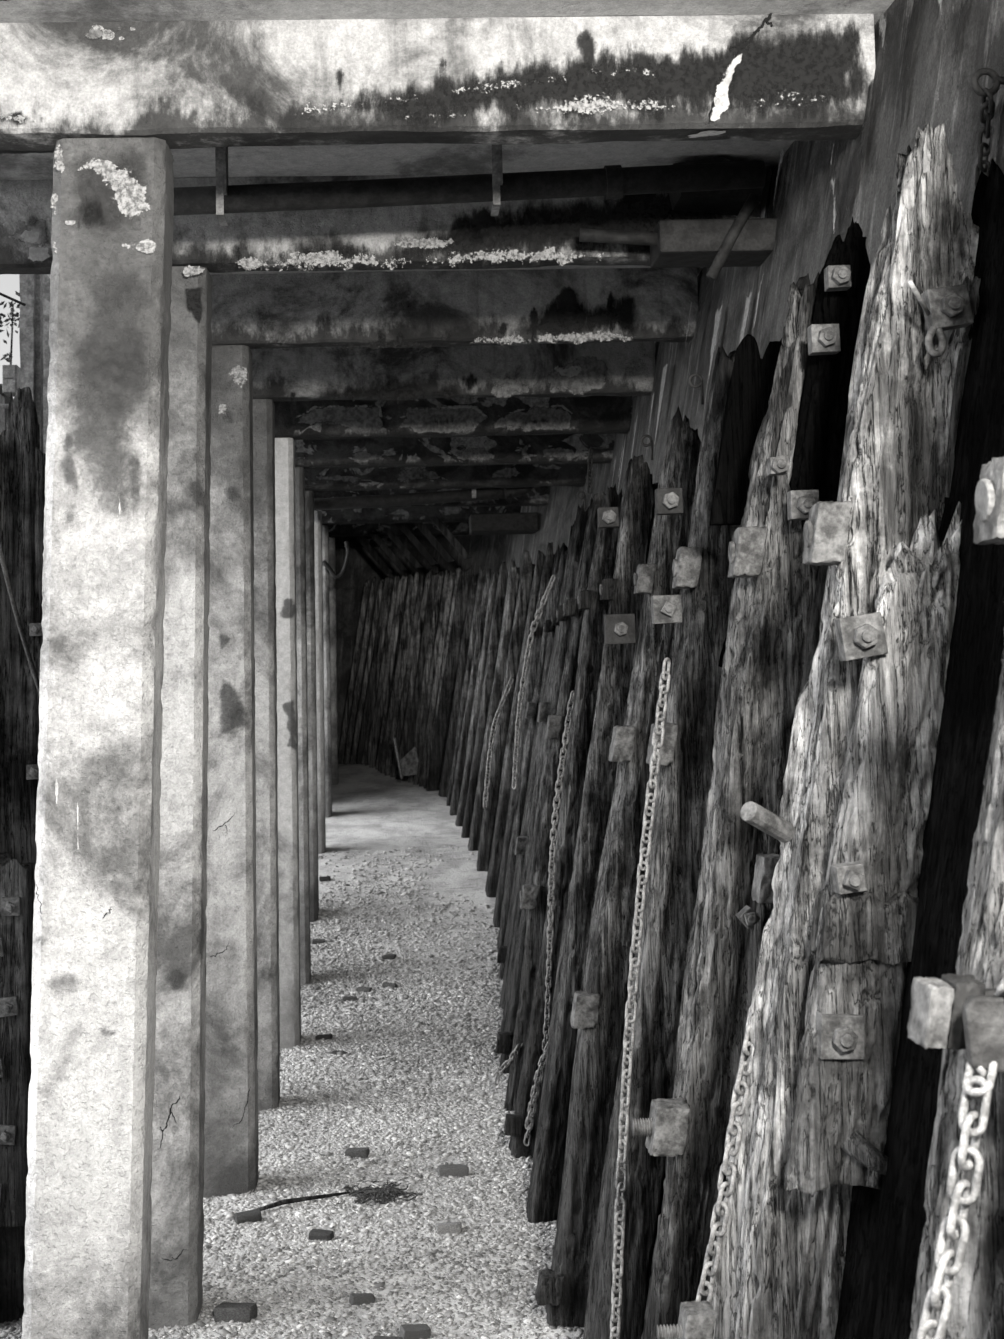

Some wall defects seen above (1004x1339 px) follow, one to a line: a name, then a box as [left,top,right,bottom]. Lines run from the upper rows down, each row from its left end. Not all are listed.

damp [335,23,869,138]
damp [78,152,143,225]
damp [305,244,368,266]
damp [395,193,722,268]
damp [528,286,635,340]
peeling [399,330,631,433]
peeling [298,405,383,432]